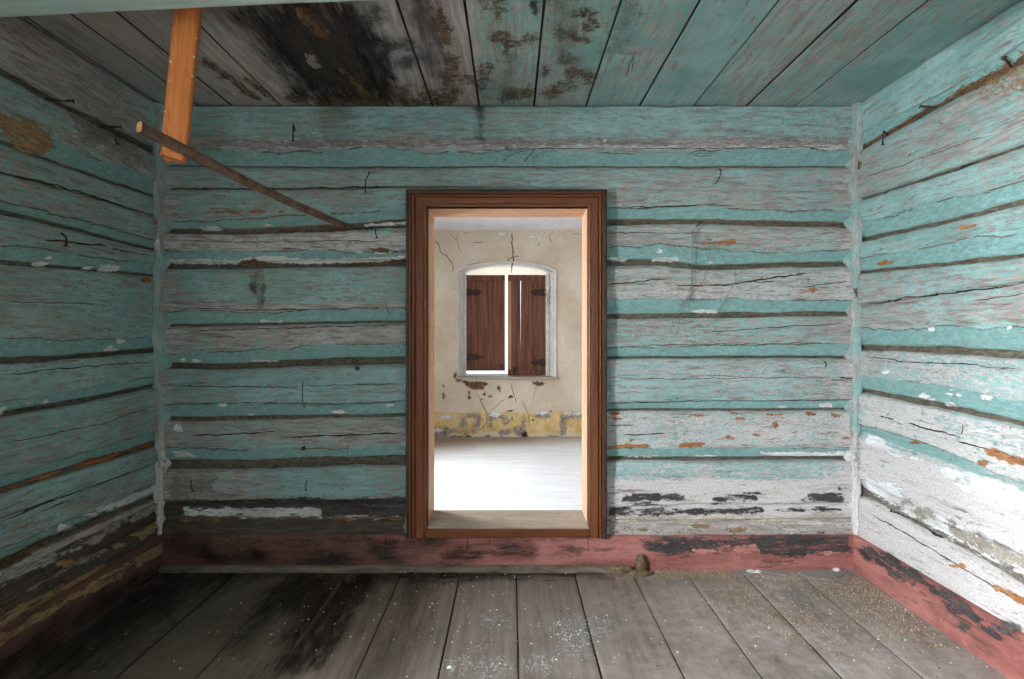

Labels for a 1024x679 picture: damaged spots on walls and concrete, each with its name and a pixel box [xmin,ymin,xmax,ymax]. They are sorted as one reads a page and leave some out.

leakage [199,0,494,107]
leakage [478,0,539,54]
leakage [499,7,600,104]
crack [435,231,484,271]
crack [508,233,579,273]
crack [472,383,535,436]
peeling [759,436,850,456]
peeling [940,448,1024,514]
peeling [0,450,406,646]
peeling [607,487,1018,641]
peeling [861,468,1024,575]
peeling [993,585,1024,606]